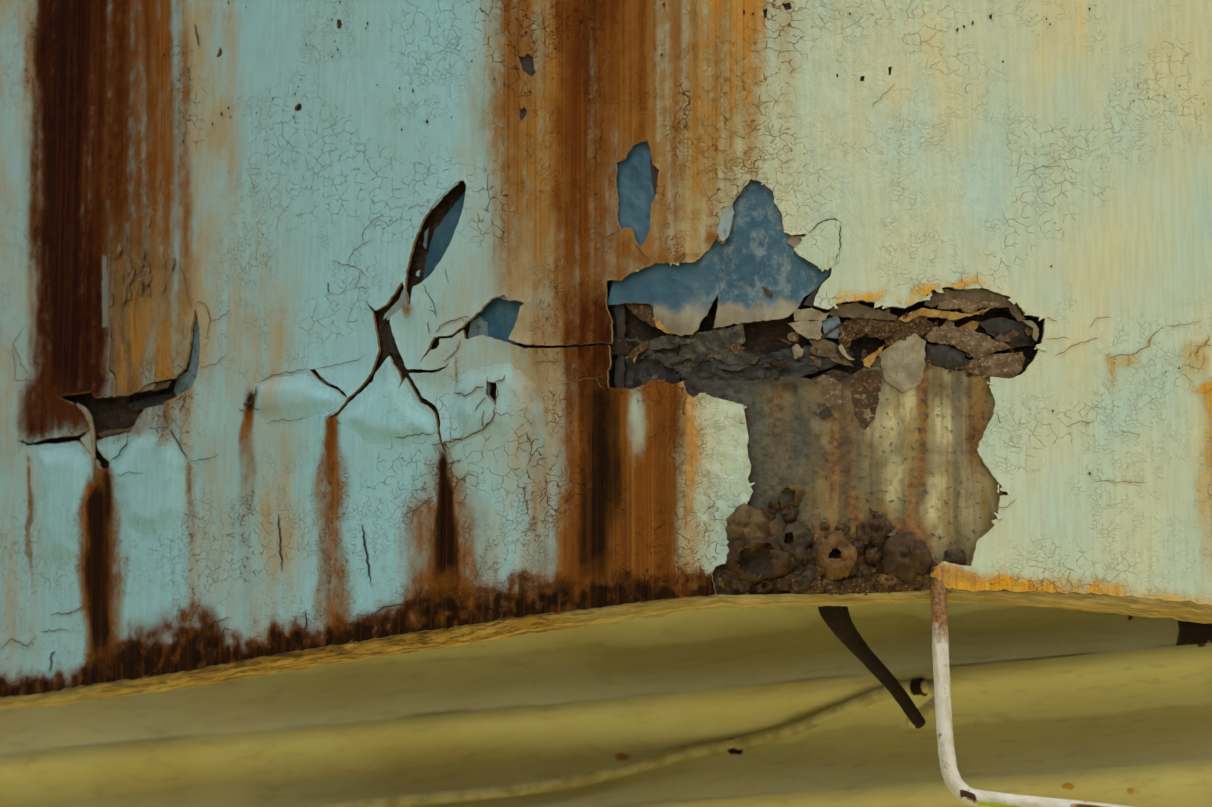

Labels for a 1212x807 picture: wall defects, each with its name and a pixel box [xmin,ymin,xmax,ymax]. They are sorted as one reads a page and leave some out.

rust [17,0,193,446]
peeling [20,313,200,485]
peeling [408,181,466,284]
peeling [617,141,659,246]
rust [480,0,797,618]
spalling [430,180,1046,596]
rust [75,464,128,663]
rust [312,413,353,629]
crack [412,474,476,519]
rust [402,441,498,598]
rust [931,562,1211,604]
peeling [1176,620,1212,647]